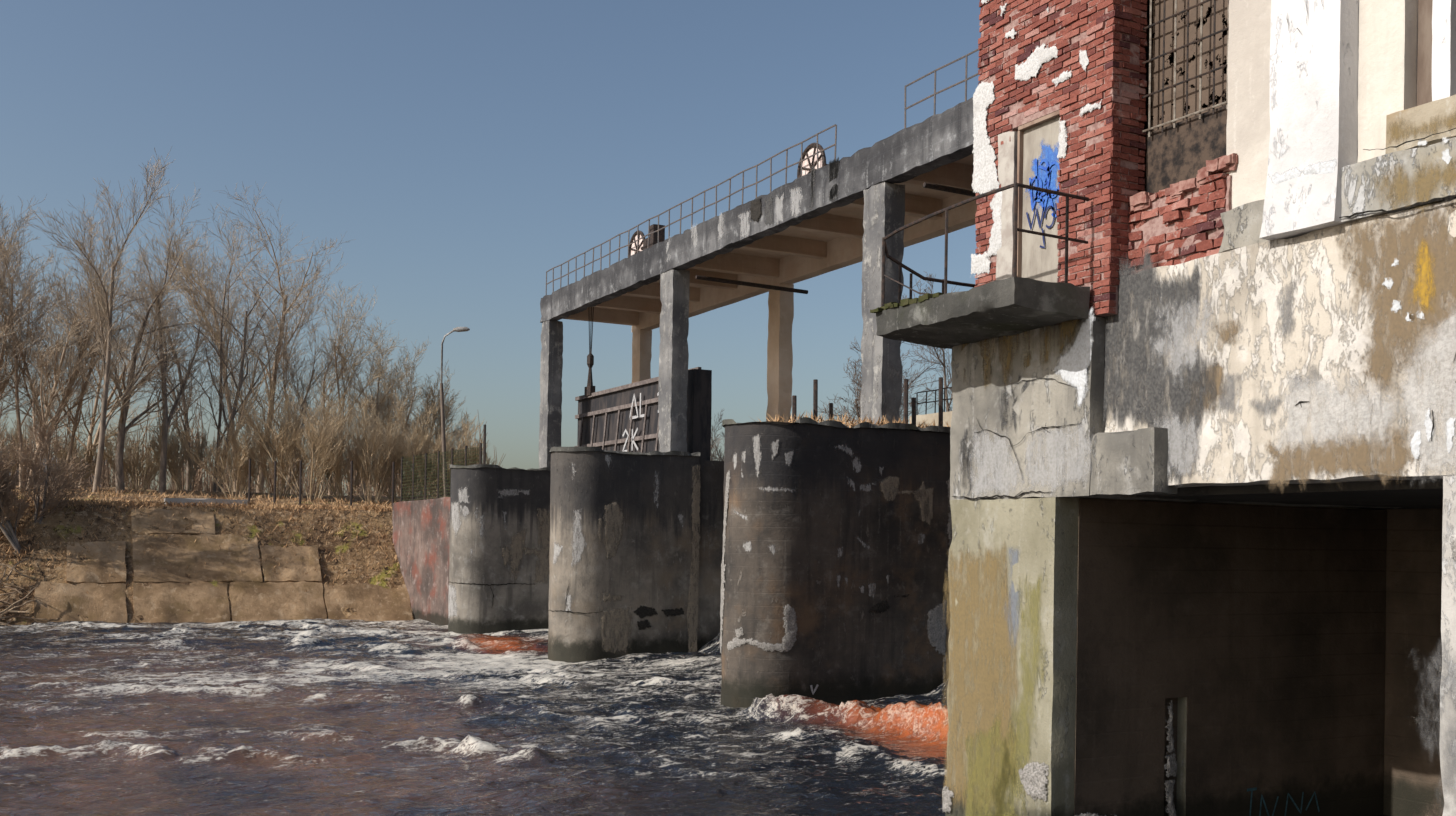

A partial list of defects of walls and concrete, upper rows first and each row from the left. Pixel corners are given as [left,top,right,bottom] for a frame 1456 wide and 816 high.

flaking render [981,0,1017,39]
flaking render [1015,43,1089,87]
flaking render [1057,100,1102,158]
flaking render [971,81,1002,278]
water stain [1282,287,1292,333]
water stain [1103,250,1238,484]
peeling [1279,317,1456,469]
crack [952,420,1081,500]
water stain [945,549,1020,816]
spalling [1019,760,1049,802]
spalling [1164,700,1178,816]